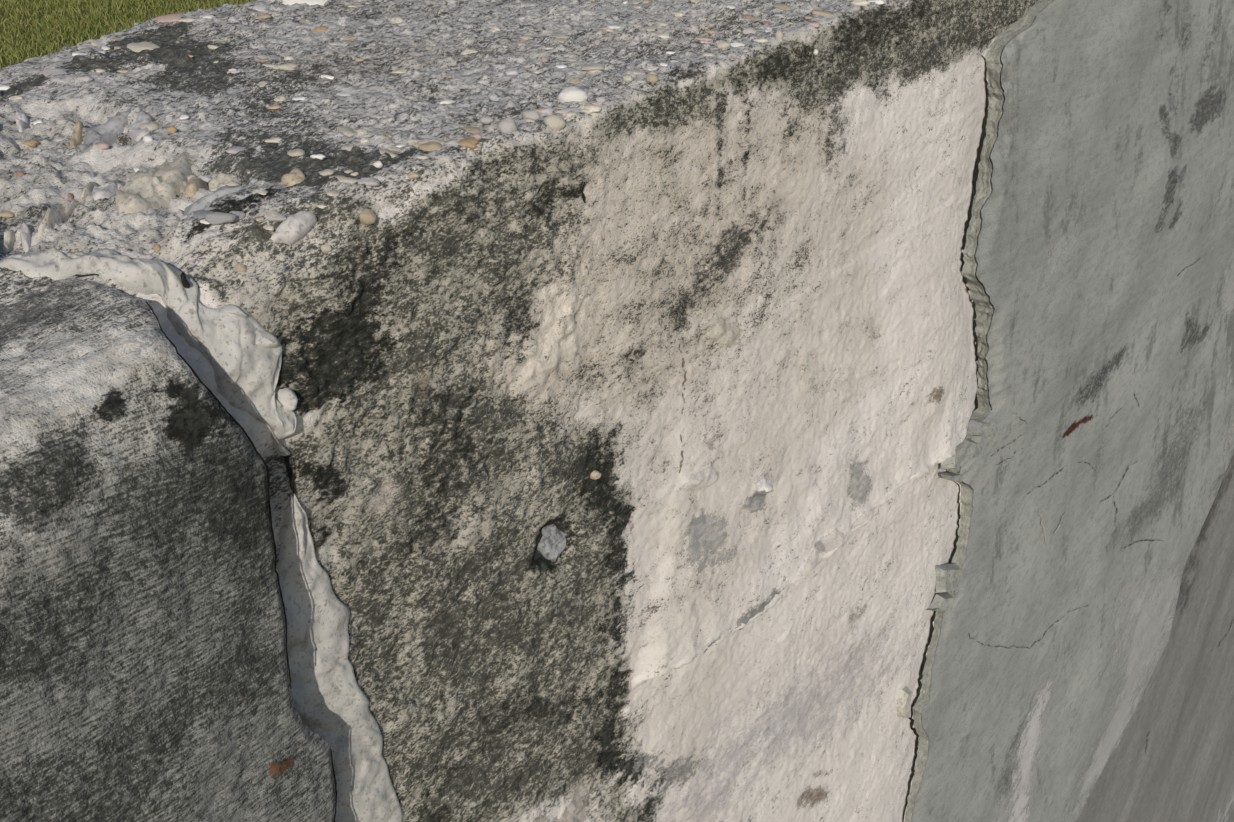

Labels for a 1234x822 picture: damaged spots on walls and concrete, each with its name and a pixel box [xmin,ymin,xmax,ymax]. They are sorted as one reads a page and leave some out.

damp [715,0,940,210]
damp [277,233,412,416]
damp [666,189,785,359]
crack [961,55,989,413]
damp [146,379,267,554]
crack [146,302,297,689]
damp [386,383,490,568]
crack [946,469,961,564]
rust [1063,415,1093,438]
crack [329,749,337,822]
damp [435,411,864,822]
crack [903,592,944,822]